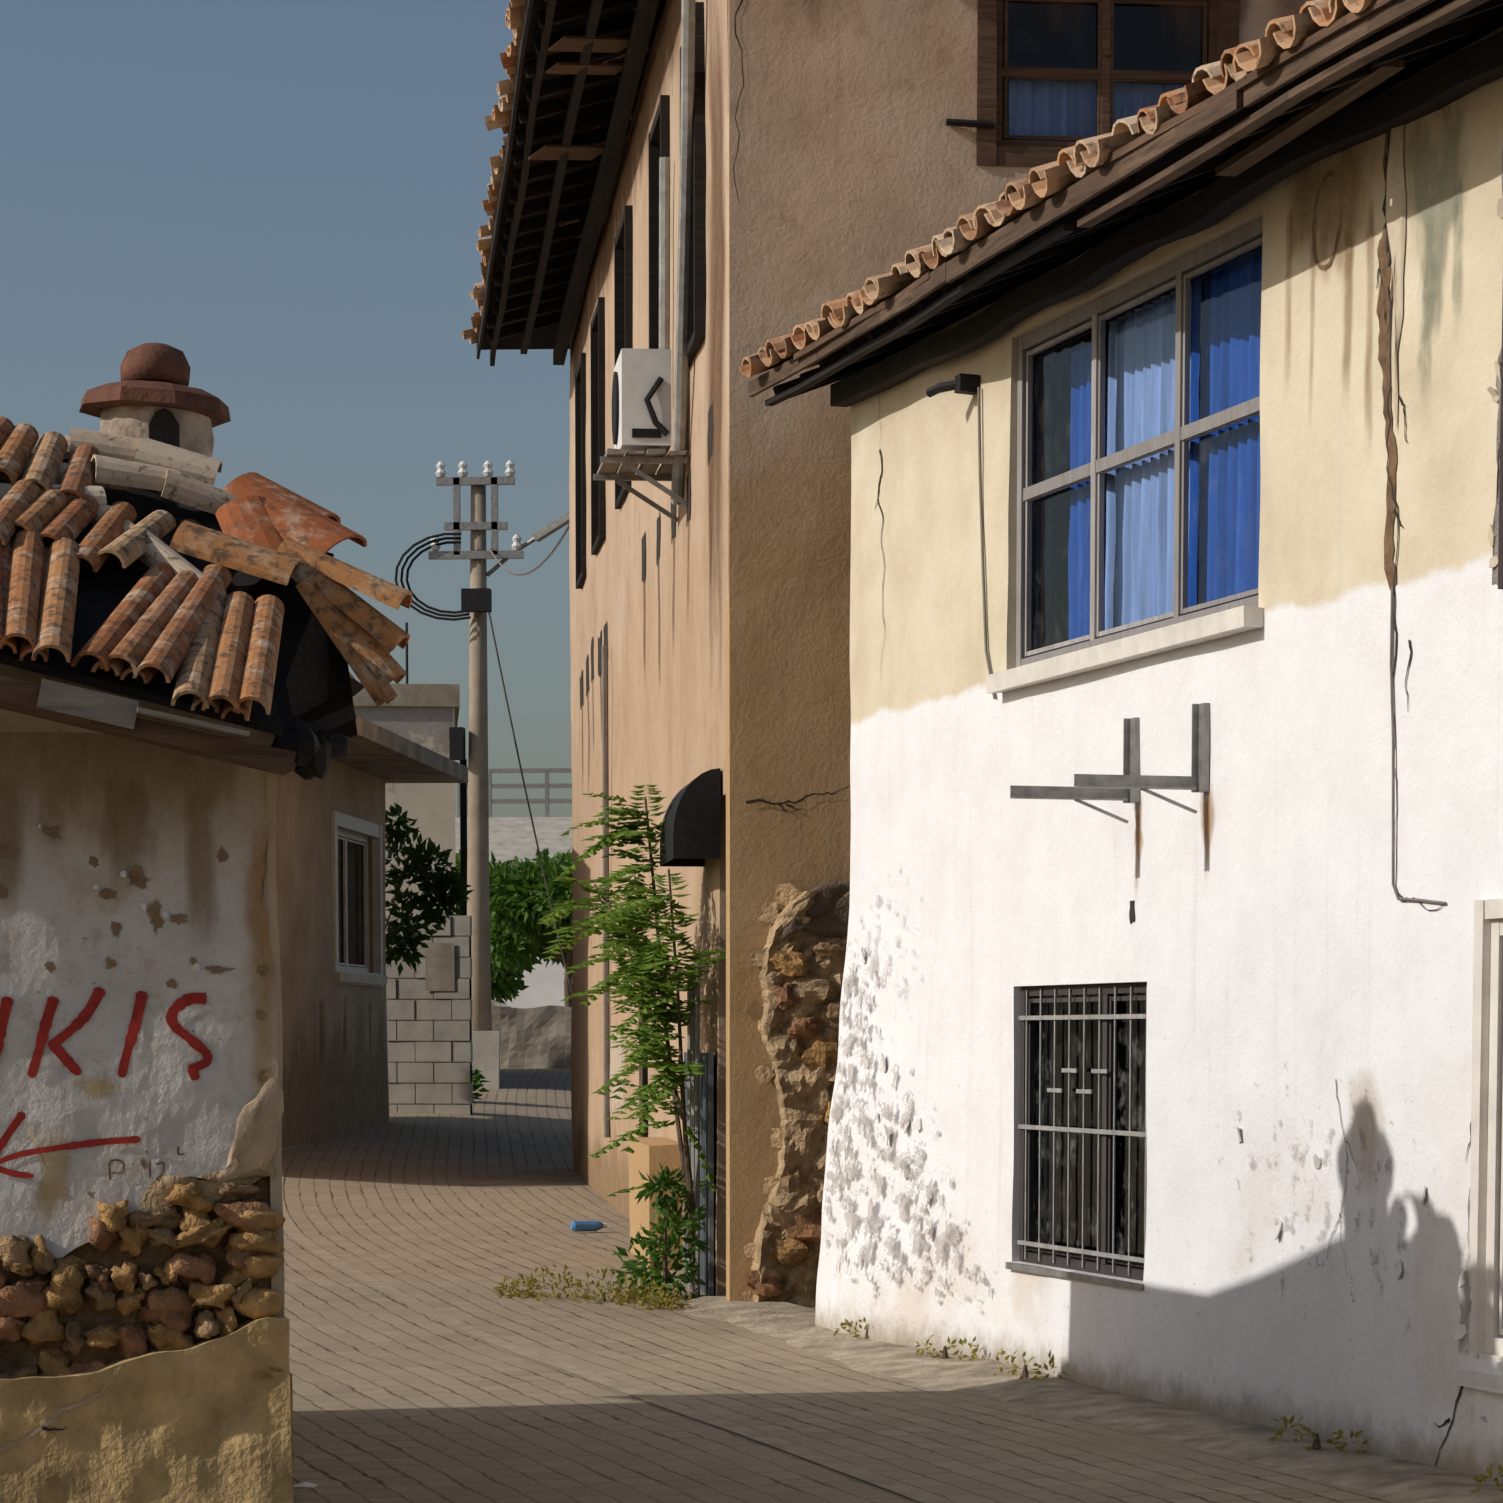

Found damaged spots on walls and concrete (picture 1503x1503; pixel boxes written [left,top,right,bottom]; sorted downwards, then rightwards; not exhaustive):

crack [733,0,744,200]
damp [1415,129,1458,312]
crack [1376,131,1412,728]
flaking render [111,922,122,938]
flaking render [89,857,187,934]
flaking render [190,957,235,974]
crack [746,785,850,812]
corrosion [1202,802,1211,840]
flaking render [741,880,996,1313]
flaking render [0,1067,286,1380]